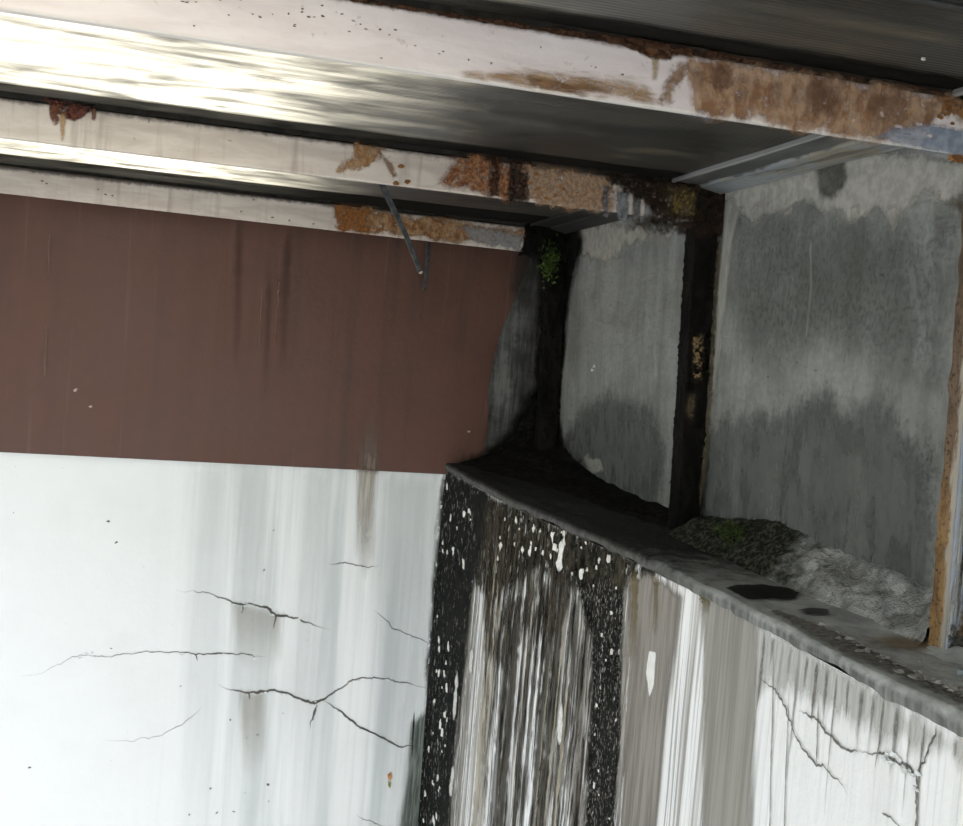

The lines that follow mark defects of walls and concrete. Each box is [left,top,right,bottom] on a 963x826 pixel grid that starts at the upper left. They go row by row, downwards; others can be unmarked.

corrosion [350,0,963,142]
corrosion [43,98,96,139]
corrosion [337,142,411,185]
corrosion [441,153,614,212]
damp [478,174,925,584]
corrosion [880,208,963,649]
damp [358,441,378,534]
crack [48,651,256,670]
crack [195,591,318,628]
damp [948,625,963,648]
crack [233,677,413,748]
crack [763,681,937,826]